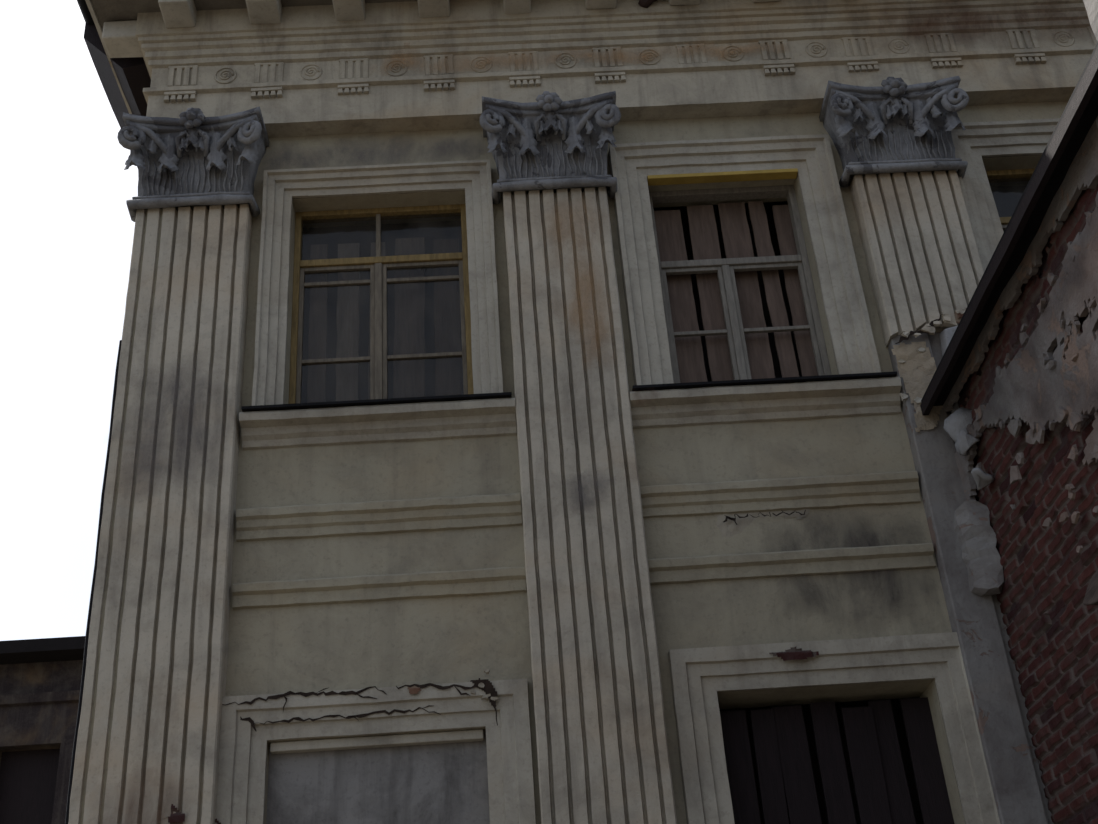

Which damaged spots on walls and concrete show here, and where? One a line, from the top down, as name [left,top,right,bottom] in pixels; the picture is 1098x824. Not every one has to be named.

flaking render [891,309,965,432]
flaking render [960,184,1098,824]
crack [222,669,499,731]
spalling [163,804,185,824]